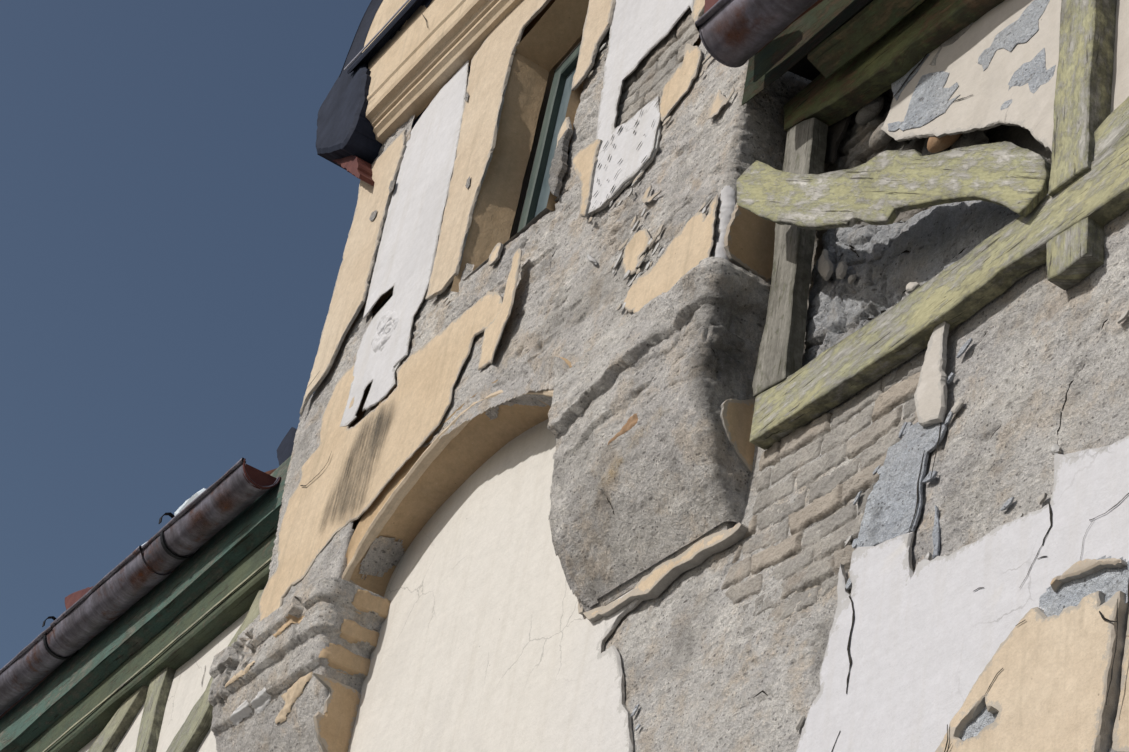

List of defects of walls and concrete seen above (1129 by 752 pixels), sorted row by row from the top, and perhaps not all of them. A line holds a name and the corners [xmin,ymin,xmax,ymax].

spalling [395,0,1129,752]
leakage [332,411,390,516]
crack [1019,502,1052,588]
crack [1080,493,1129,559]
spalling [208,521,405,752]
crack [846,596,854,694]
crack [1099,599,1118,705]